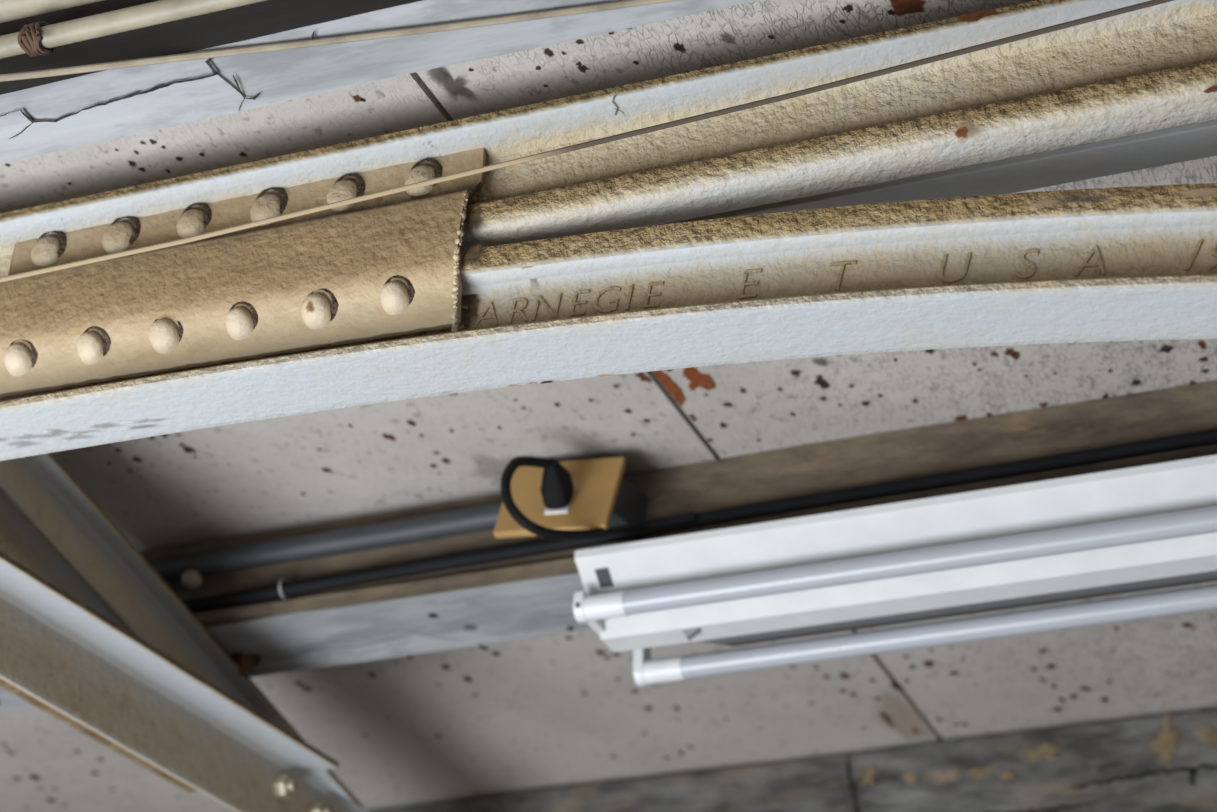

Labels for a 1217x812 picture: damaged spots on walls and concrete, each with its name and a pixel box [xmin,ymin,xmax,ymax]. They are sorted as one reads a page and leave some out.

corrosion [890,0,926,16]
peeling [0,73,245,173]
corrosion [635,367,716,421]